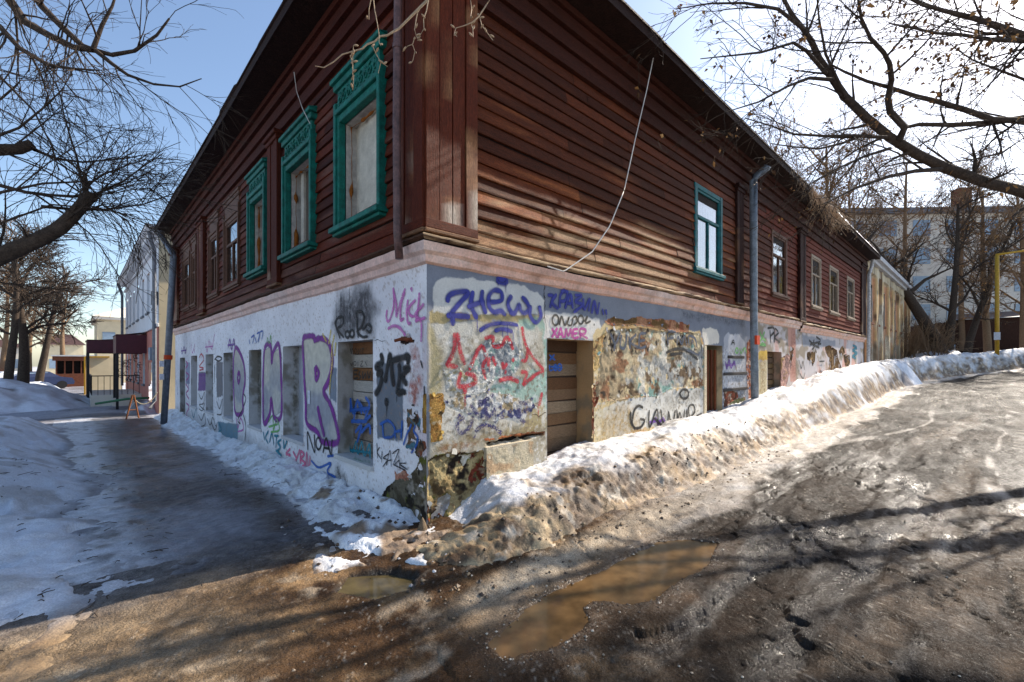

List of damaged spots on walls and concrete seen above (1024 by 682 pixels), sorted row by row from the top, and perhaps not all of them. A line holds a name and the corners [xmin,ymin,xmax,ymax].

spalling [405,339,545,525]
peeling [591,316,704,438]
spalling [807,345,850,370]